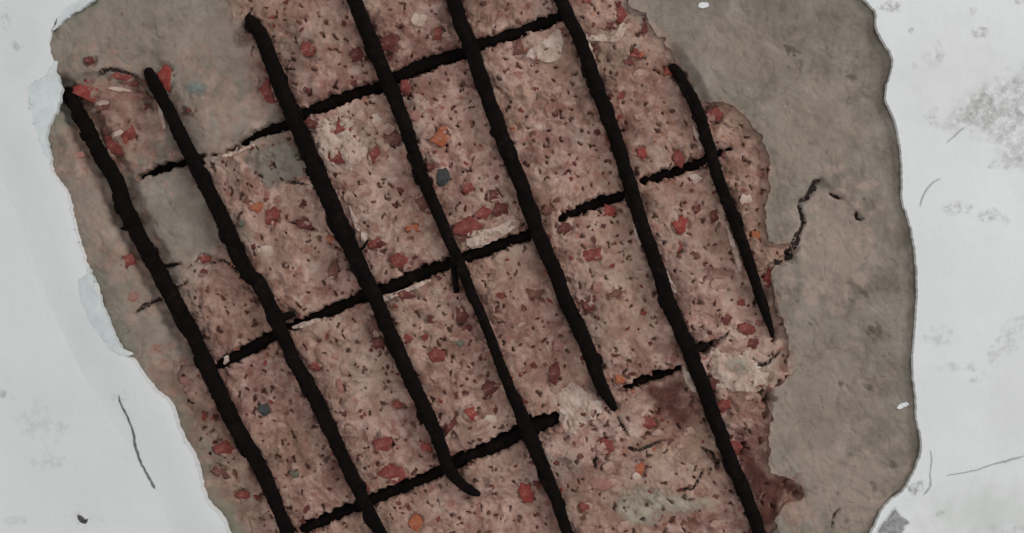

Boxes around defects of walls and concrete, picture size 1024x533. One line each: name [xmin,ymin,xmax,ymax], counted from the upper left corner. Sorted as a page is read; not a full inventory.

corrosion [62,87,85,141]
corrosion [579,54,596,100]
corrosion [668,65,703,144]
corrosion [406,153,433,187]
corrosion [325,215,356,236]
crack [771,179,865,266]
spalling [27,0,752,533]
spalling [569,0,920,533]
corrosion [650,384,686,421]
corrosion [537,447,566,519]
corrosion [740,442,797,524]